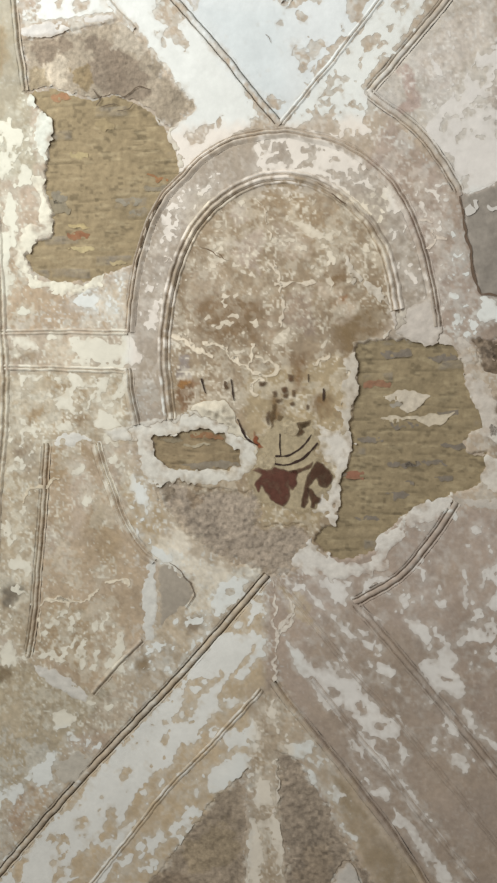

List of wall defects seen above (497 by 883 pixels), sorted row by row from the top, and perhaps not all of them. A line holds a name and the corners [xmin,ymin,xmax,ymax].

spalling [0,0,425,330]
peeling [407,182,449,217]
peeling [426,39,497,194]
peeling [242,319,293,344]
peeling [0,520,32,595]
spalling [6,335,257,535]
peeling [148,538,173,564]
spalling [270,215,497,701]
peeling [0,576,285,883]
peeling [265,699,332,785]
peeling [283,635,463,883]
peeling [386,564,497,774]